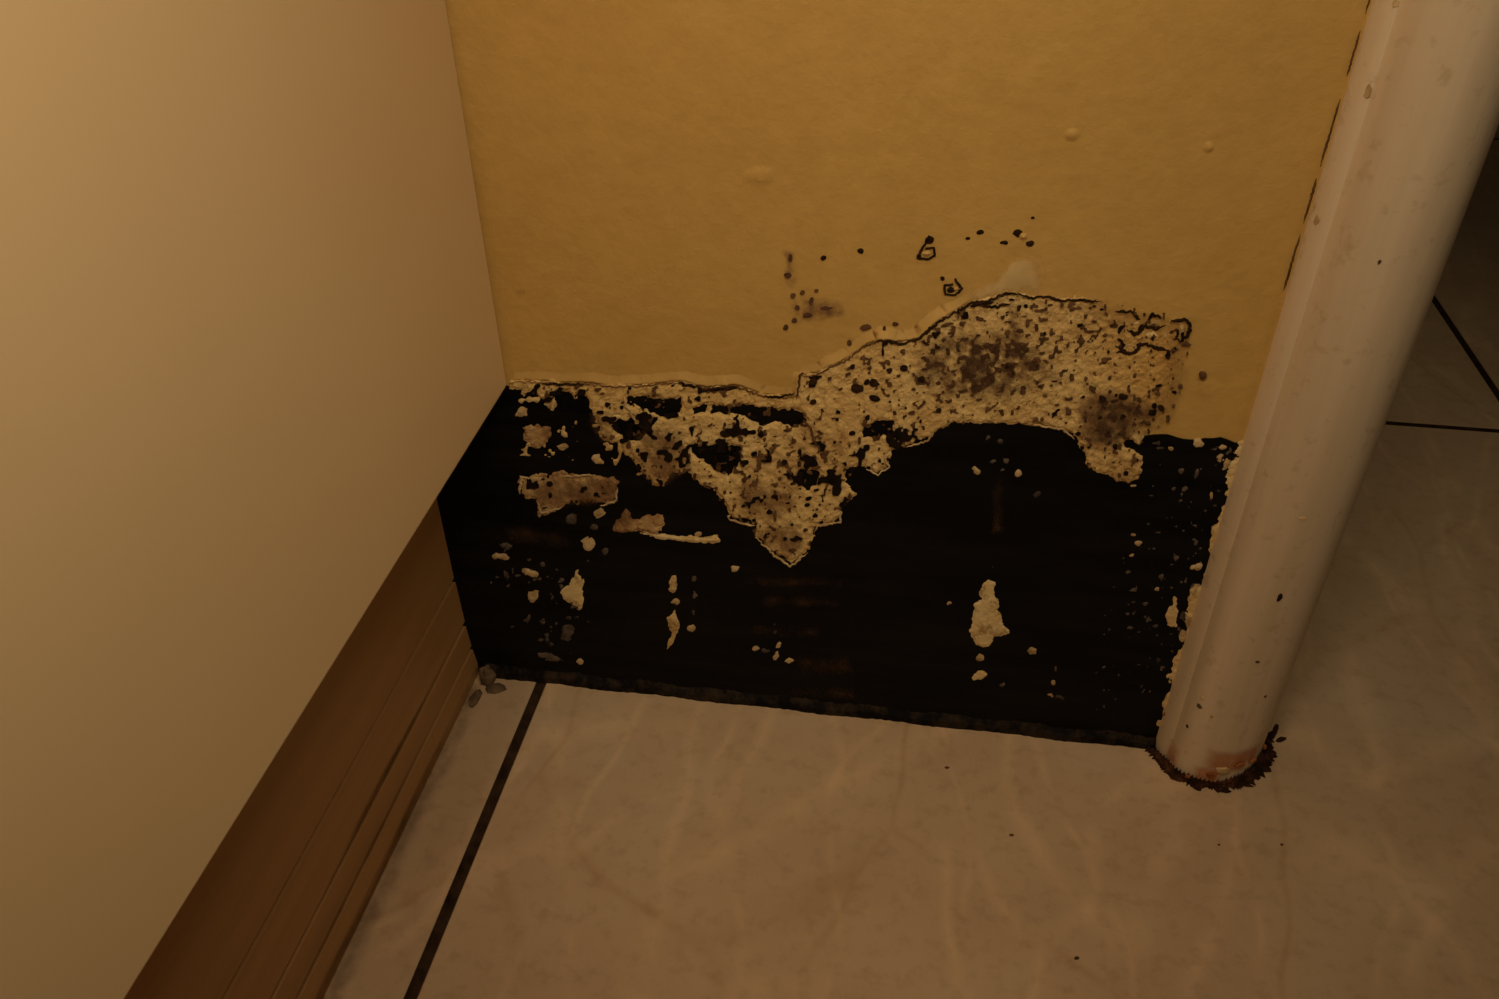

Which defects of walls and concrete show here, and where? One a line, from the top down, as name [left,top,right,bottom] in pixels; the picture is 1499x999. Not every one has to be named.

damp [783,254,833,330]
damp [975,261,1037,298]
damp [847,322,899,346]
damp [921,322,1036,395]
peeling [490,291,1207,665]
peeling [1103,437,1244,727]
peeling [969,566,1010,687]
corrosion [1145,724,1287,793]